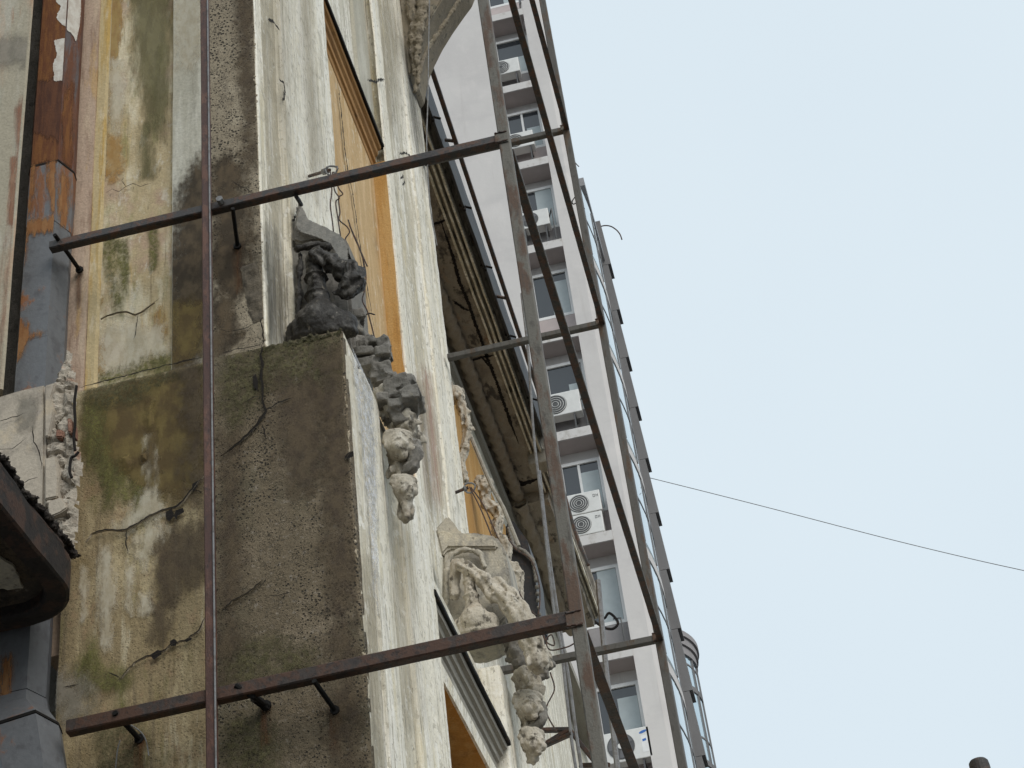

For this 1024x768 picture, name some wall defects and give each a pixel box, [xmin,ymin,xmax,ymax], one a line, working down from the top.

peeling [53,0,81,81]
rust [9,104,22,225]
rust [25,0,70,253]
crack [101,298,160,337]
spalling [0,350,83,559]
leakage [79,300,204,646]
crack [85,475,204,551]
crack [80,319,291,456]
spalling [343,308,426,616]
crack [108,577,287,680]